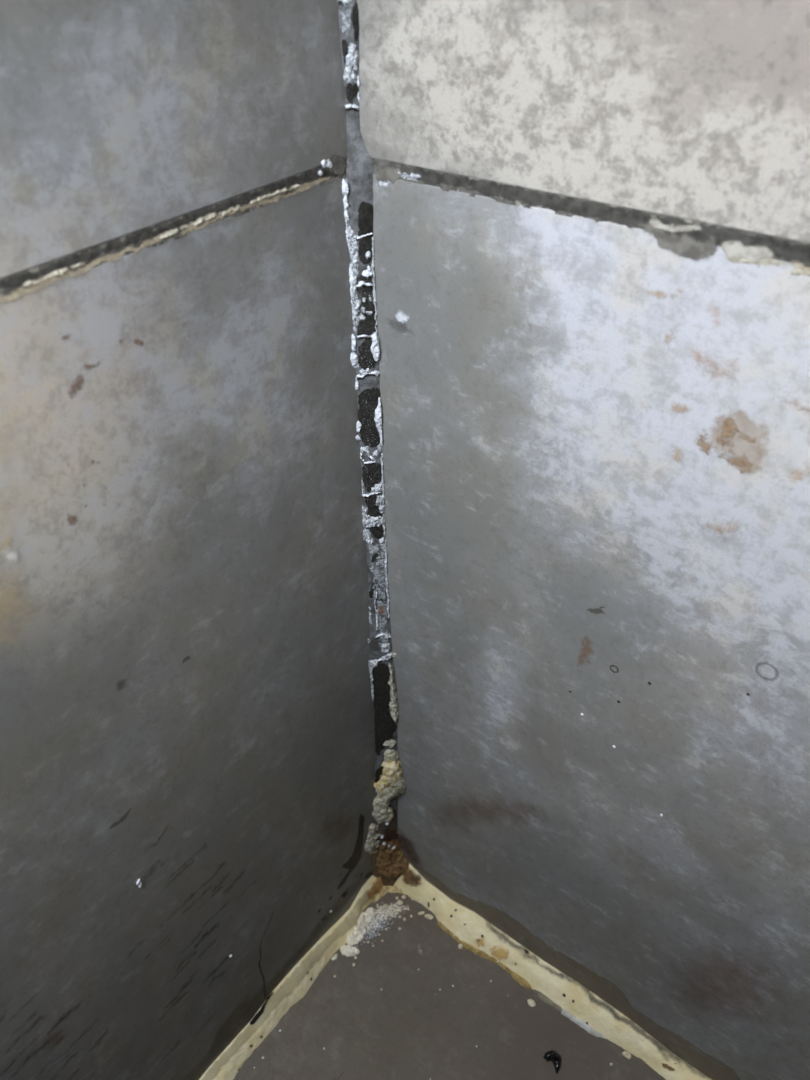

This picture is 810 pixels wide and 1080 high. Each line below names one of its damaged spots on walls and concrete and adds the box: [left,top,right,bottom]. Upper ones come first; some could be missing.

corrosion [697,418,754,473]
damp [318,797,394,913]
crack [250,911,274,1025]
damp [331,902,409,960]